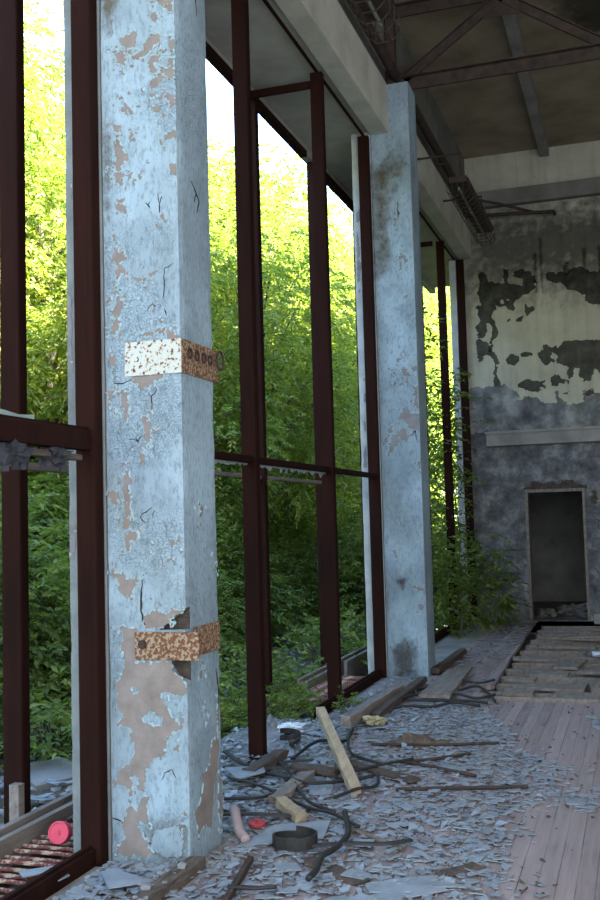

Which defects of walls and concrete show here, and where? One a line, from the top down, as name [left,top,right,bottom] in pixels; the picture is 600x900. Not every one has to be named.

peeling [104,0,179,367]
peeling [468,266,600,435]
crack [139,573,147,625]
peeling [107,596,207,861]